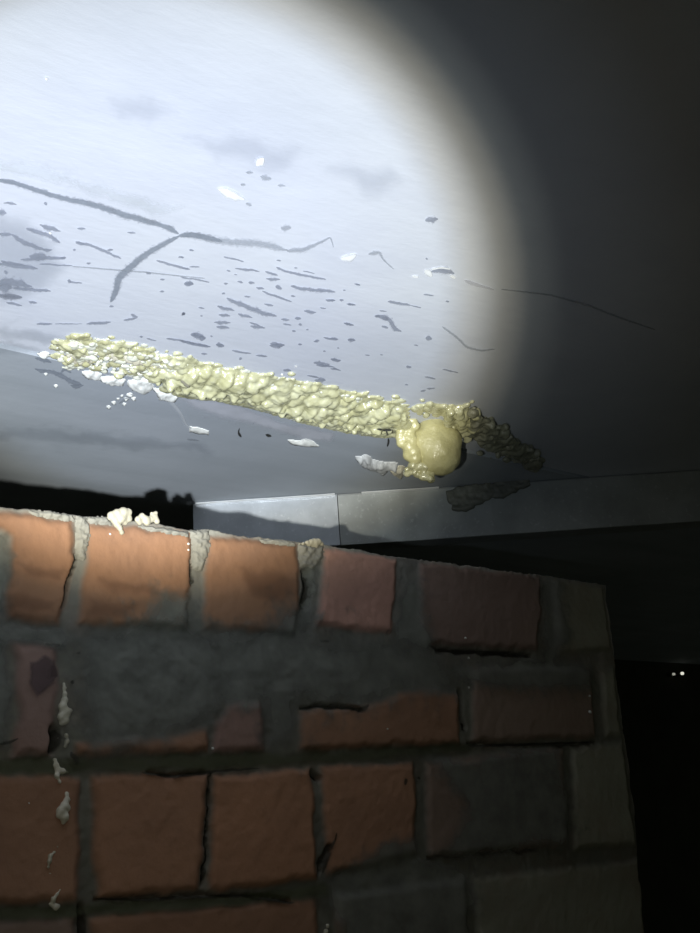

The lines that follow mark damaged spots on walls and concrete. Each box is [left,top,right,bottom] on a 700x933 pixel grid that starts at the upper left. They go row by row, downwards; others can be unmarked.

crack [0,179,222,302]
crack [76,768,294,933]
crack [320,833,337,872]